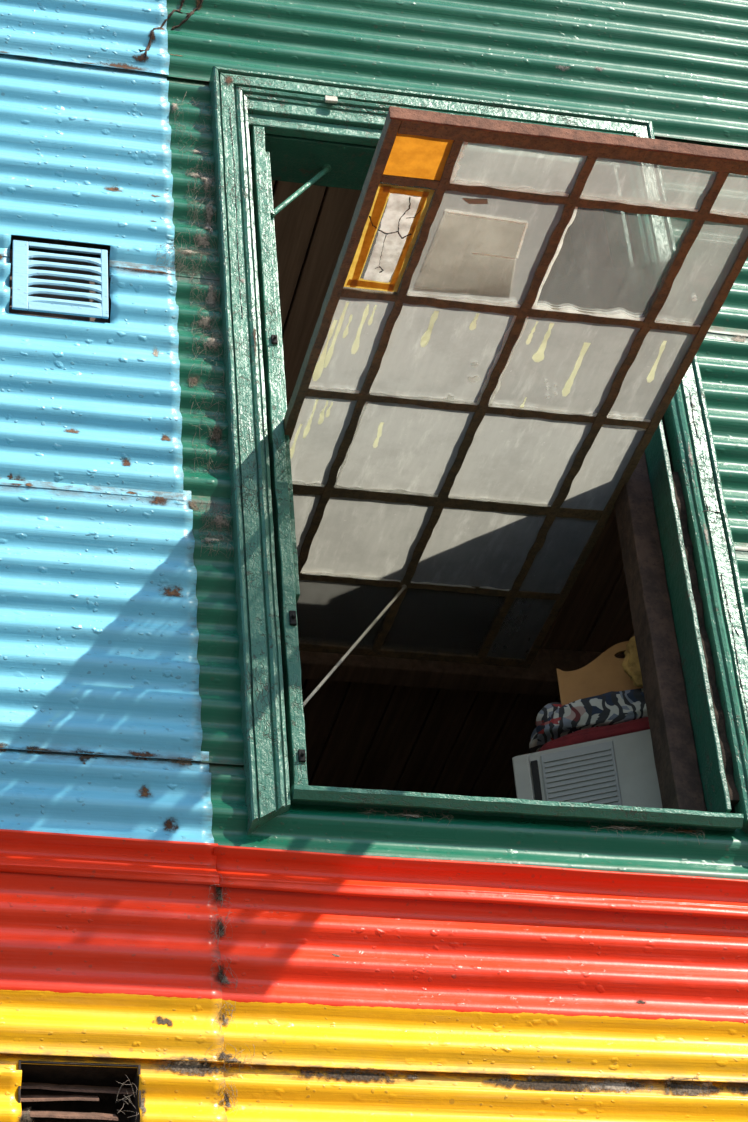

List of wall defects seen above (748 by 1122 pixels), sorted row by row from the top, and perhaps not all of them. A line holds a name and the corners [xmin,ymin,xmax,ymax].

crack [132,0,203,62]
corrosion [160,586,183,597]
corrosion [129,751,155,761]